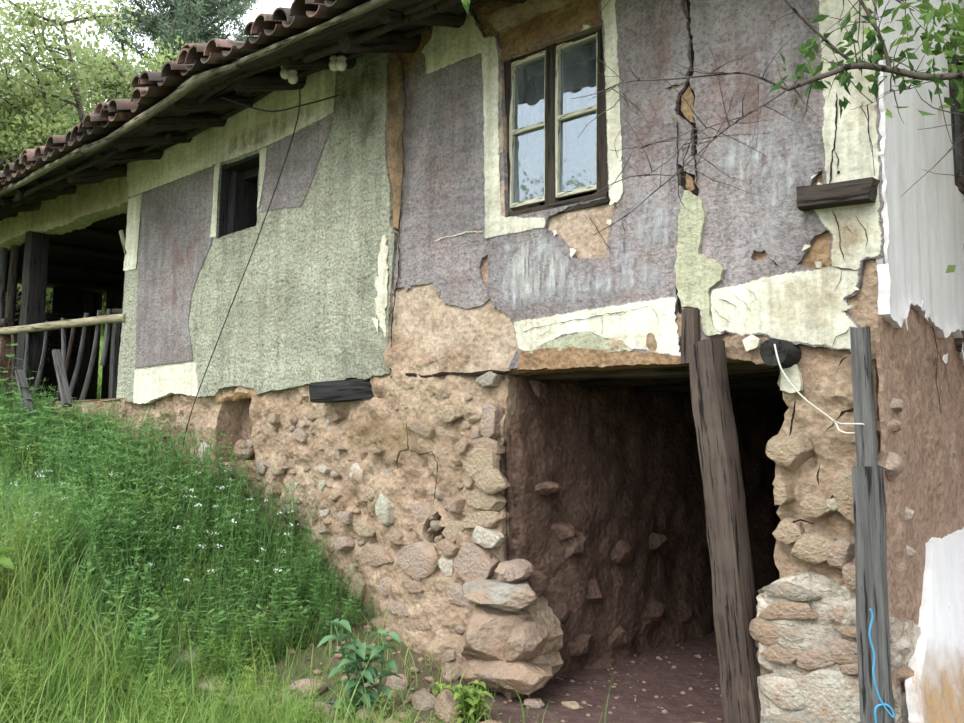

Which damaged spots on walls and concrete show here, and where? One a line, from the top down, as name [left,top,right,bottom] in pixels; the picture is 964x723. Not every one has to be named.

peeling [473,0,602,62]
crack [665,0,699,196]
crack [829,93,839,183]
crack [389,87,509,378]
peeling [548,197,617,259]
spalling [799,231,832,268]
crack [832,211,868,288]
crack [396,423,438,502]